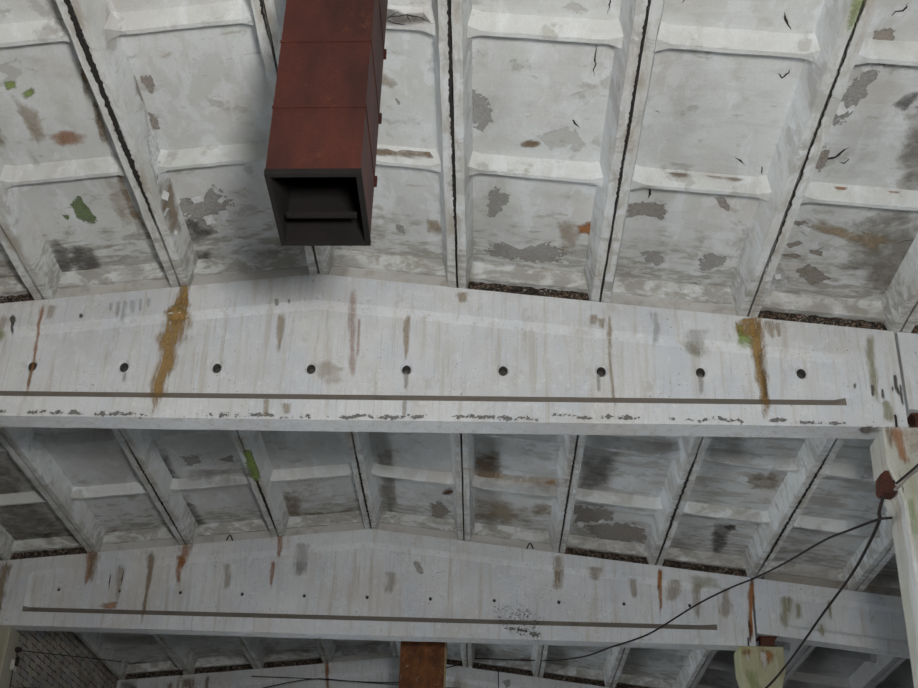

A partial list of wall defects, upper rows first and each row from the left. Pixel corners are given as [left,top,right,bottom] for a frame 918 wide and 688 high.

peeling [832,63,885,126]
water stain [897,93,918,109]
peeling [486,186,509,217]
peeling [486,241,570,264]
peeling [782,217,832,285]
water stain [813,213,914,287]
rust [151,285,190,407]
rust [736,318,769,408]
rust [892,429,905,461]
rust [177,545,189,580]
rust [744,583,754,654]